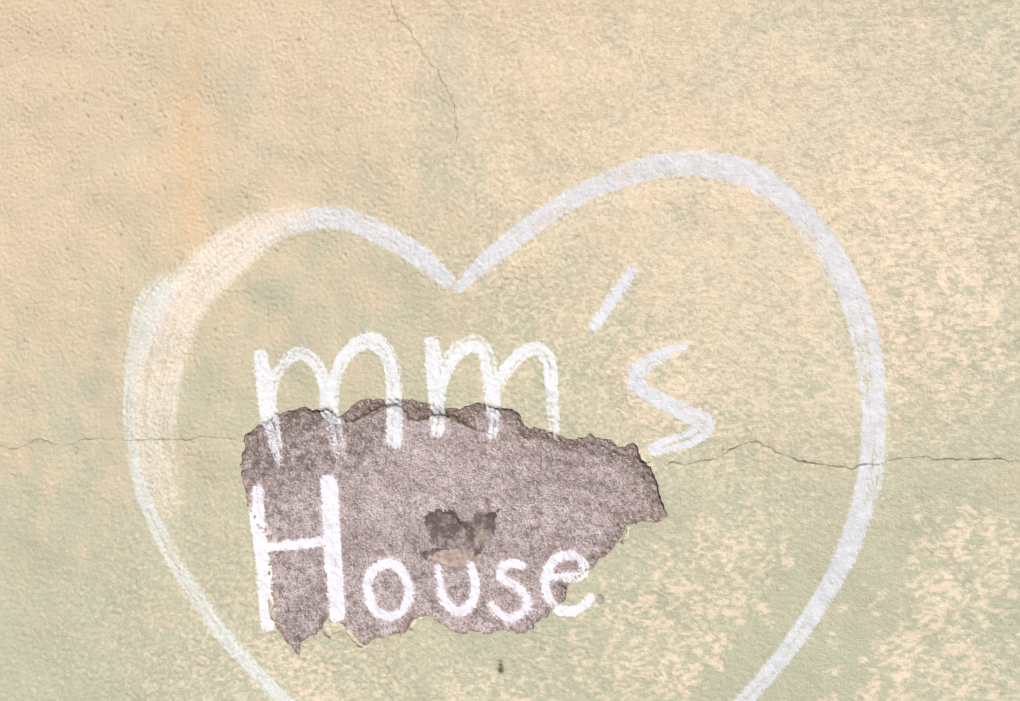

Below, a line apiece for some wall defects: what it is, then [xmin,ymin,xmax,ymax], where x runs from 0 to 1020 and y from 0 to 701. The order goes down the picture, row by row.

peeling [237,398,814,701]